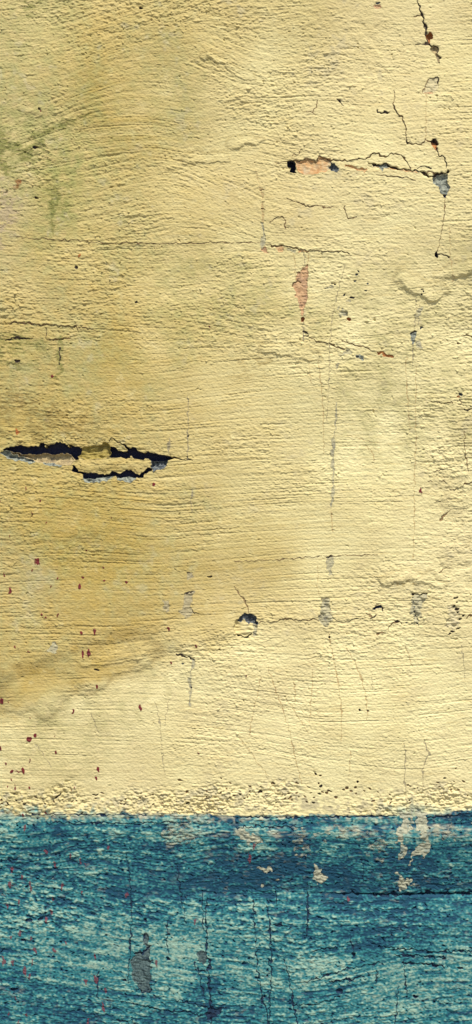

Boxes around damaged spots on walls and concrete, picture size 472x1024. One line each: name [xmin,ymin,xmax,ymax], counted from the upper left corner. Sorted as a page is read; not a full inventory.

crack [414,0,441,63]
crack [377,91,426,145]
spalling [275,139,451,198]
crack [435,202,455,282]
spalling [0,397,193,483]
peeling [206,773,458,892]
peeling [130,933,153,993]